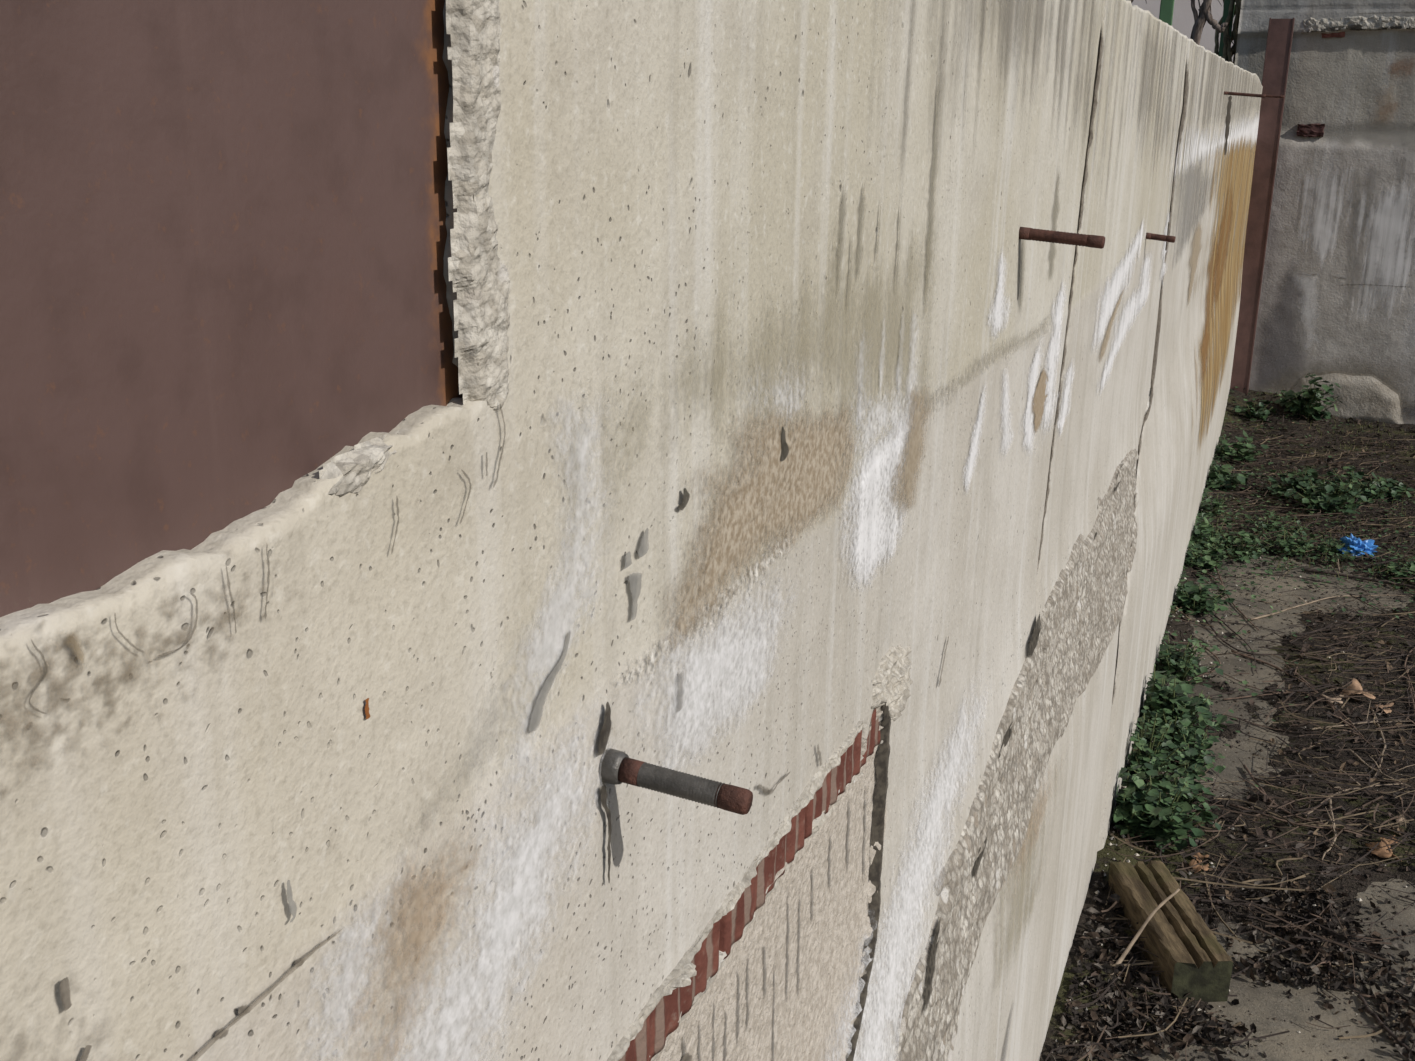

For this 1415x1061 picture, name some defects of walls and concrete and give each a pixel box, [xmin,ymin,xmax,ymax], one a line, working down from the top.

spalling [315,434,397,498]
spalling [446,0,510,412]
damp [653,94,938,767]
damp [1002,177,1074,451]
crack [1037,29,1103,570]
crack [1134,60,1189,506]
damp [1092,24,1261,391]
damp [1358,190,1415,311]
crack [190,930,341,1061]
peeling [606,645,913,1061]
crack [846,702,891,1061]
spalling [893,449,1139,1061]